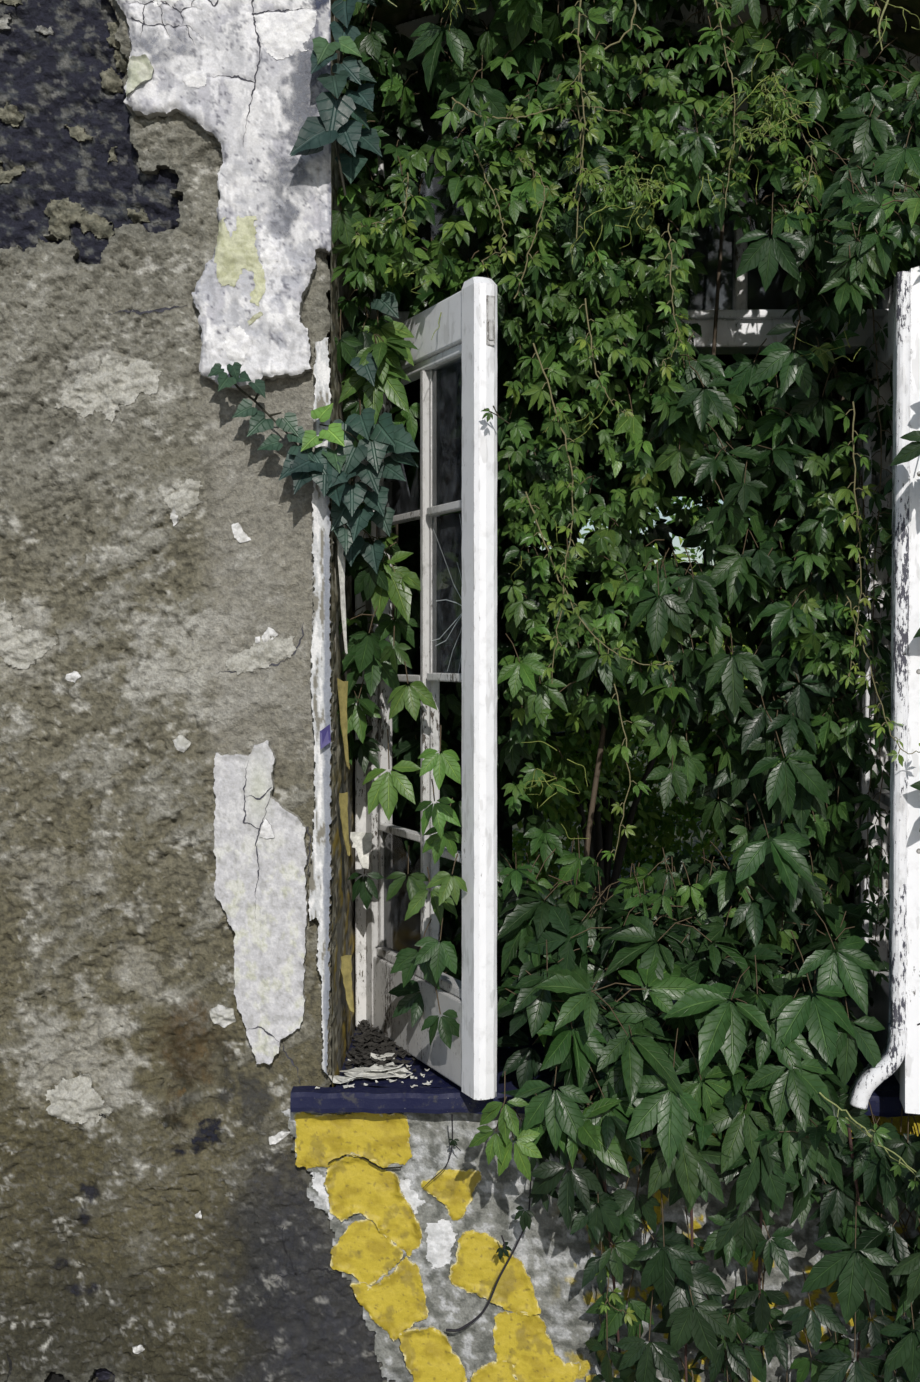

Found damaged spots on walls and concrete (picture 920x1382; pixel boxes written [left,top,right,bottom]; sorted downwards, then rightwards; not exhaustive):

spalling [0,0,184,265]
crack [131,0,313,137]
crack [243,760,272,918]
flaking render [210,739,309,1064]
peeling [269,1112,596,1382]
spalling [45,1372,70,1382]
spalling [94,1368,115,1382]